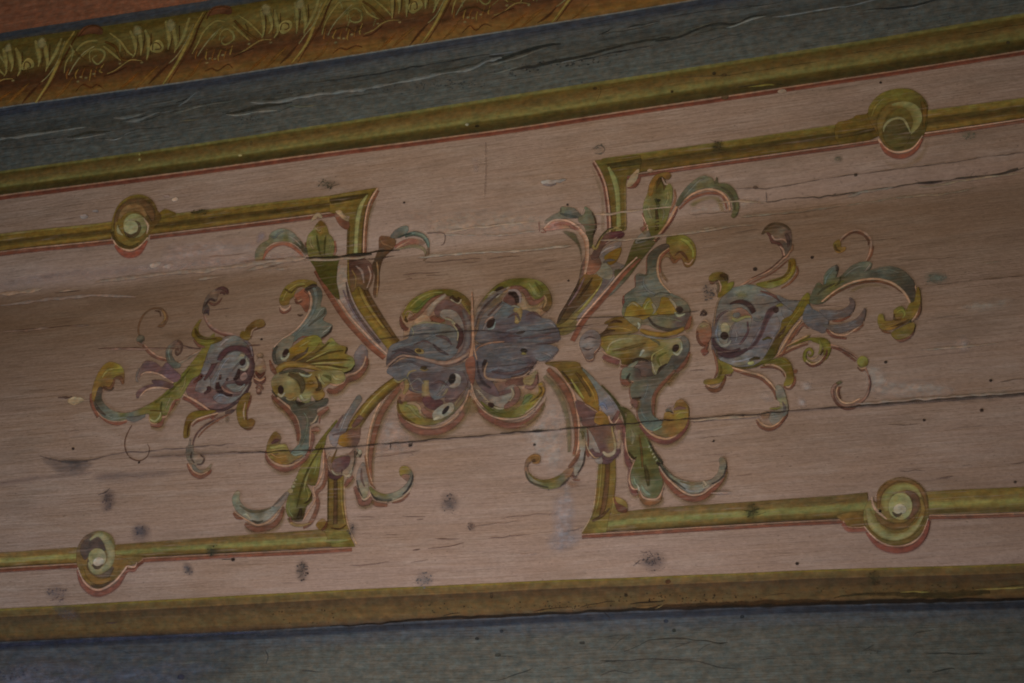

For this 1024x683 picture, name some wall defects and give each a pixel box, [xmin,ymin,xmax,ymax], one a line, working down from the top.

crack [715,152,1024,230]
crack [306,250,398,262]
crack [370,310,700,341]
crack [41,343,1024,494]